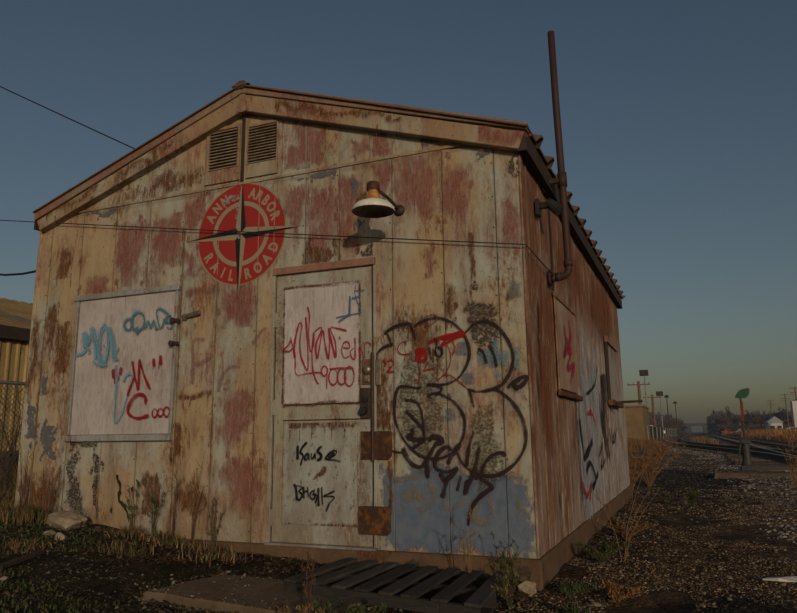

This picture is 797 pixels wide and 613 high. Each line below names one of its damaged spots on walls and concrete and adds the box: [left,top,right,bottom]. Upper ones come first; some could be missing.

rust [53,250,73,287]
rust [27,303,72,422]
peeling [21,376,57,461]